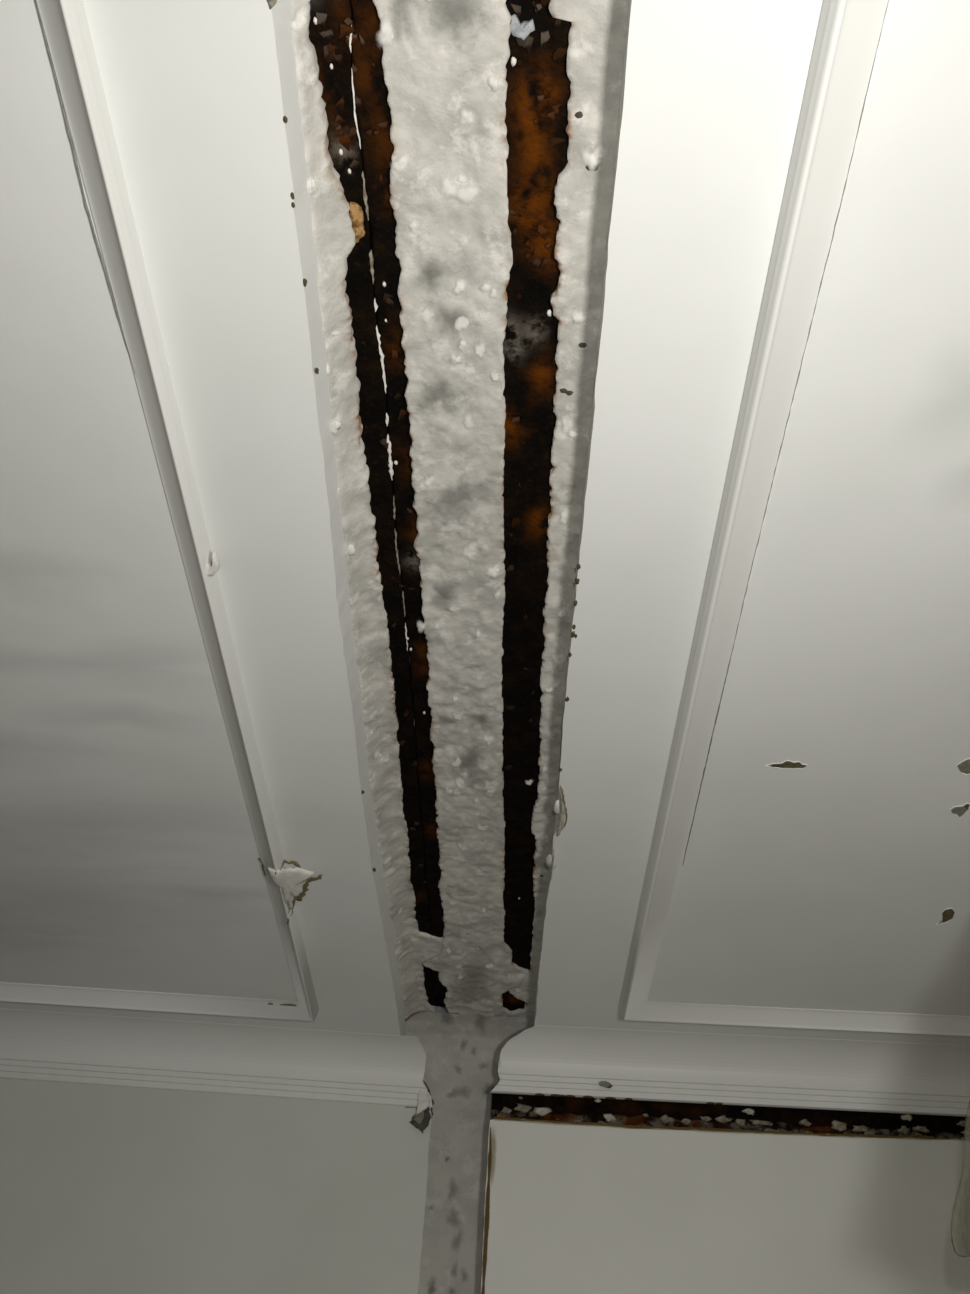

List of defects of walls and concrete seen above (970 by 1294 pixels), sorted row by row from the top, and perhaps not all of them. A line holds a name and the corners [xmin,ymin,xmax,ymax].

corrosion [511,0,550,18]
corrosion [316,12,375,76]
corrosion [512,19,567,93]
corrosion [335,97,379,176]
corrosion [349,202,365,243]
spalling [258,0,629,1294]
peeling [765,760,807,769]
peeling [956,758,970,775]
peeling [950,803,970,818]
peeling [936,908,955,925]